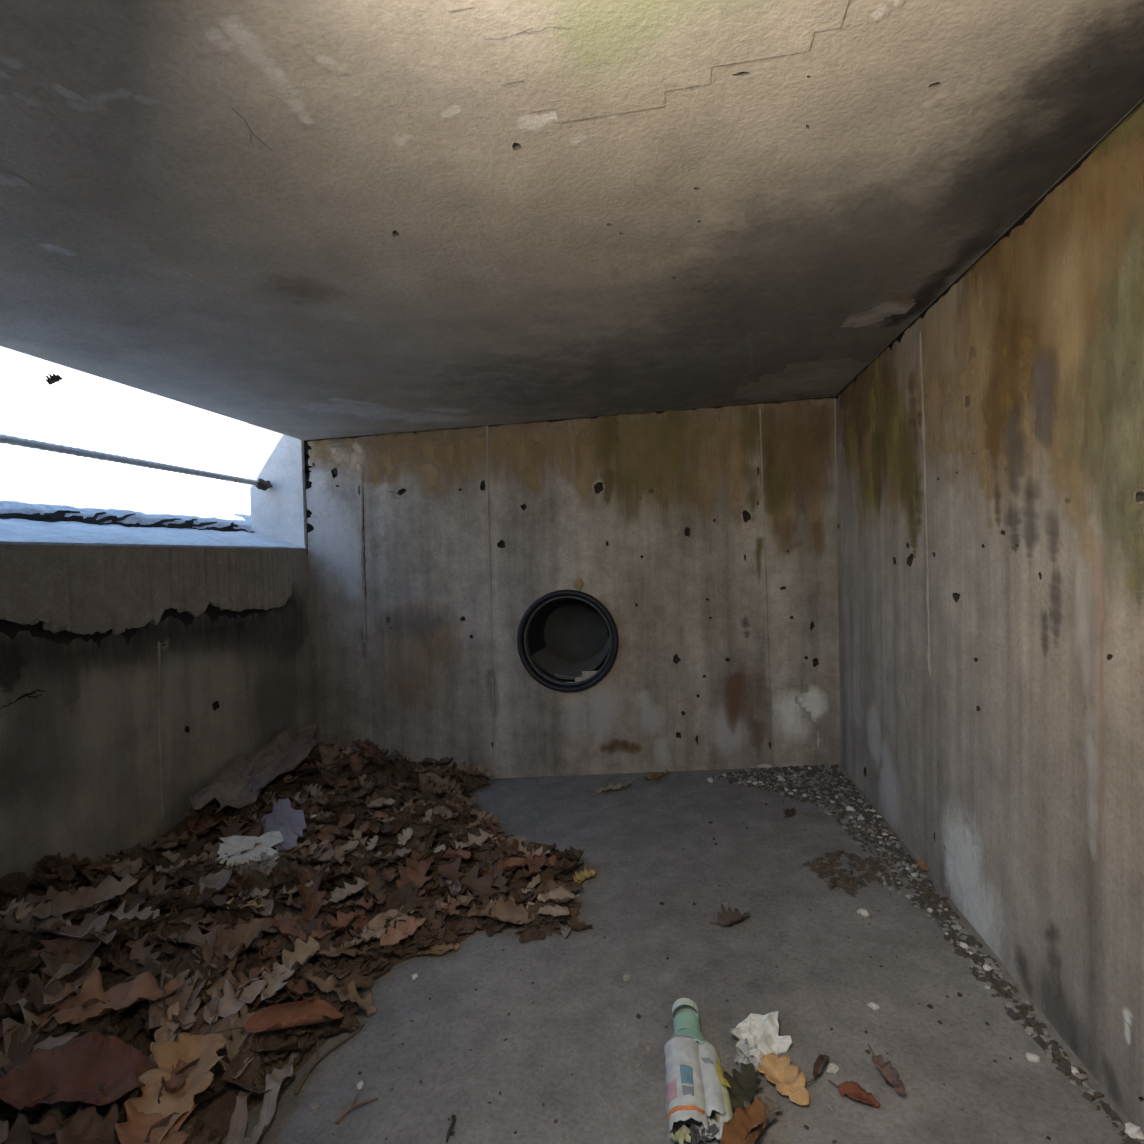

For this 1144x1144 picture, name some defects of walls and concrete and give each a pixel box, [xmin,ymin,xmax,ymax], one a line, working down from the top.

crack [484,27,575,40]
leakage [279,1,1144,553]
leakage [306,484,387,604]
leakage [558,671,681,772]
leakage [697,680,830,770]